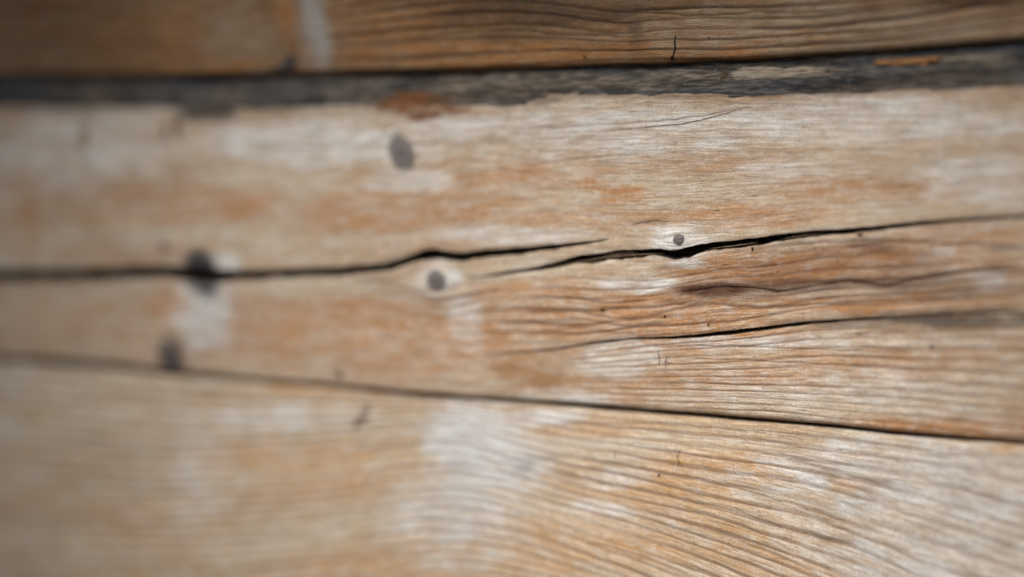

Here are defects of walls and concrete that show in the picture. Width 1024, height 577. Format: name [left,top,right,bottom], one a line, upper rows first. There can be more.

crack [0,215,1024,283]
crack [497,312,1024,364]